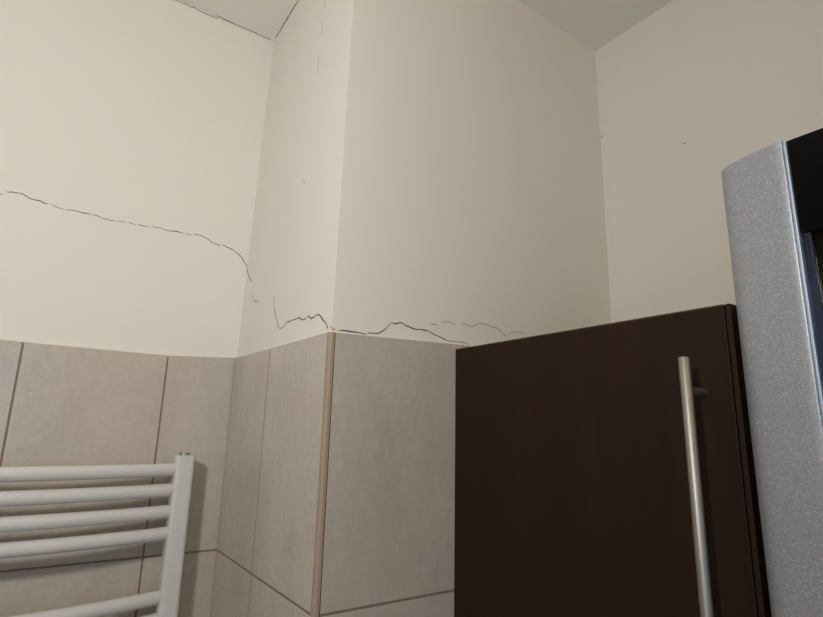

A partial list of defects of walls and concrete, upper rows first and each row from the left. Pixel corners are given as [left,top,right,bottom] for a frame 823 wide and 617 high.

crack [176,0,299,40]
crack [0,192,523,345]